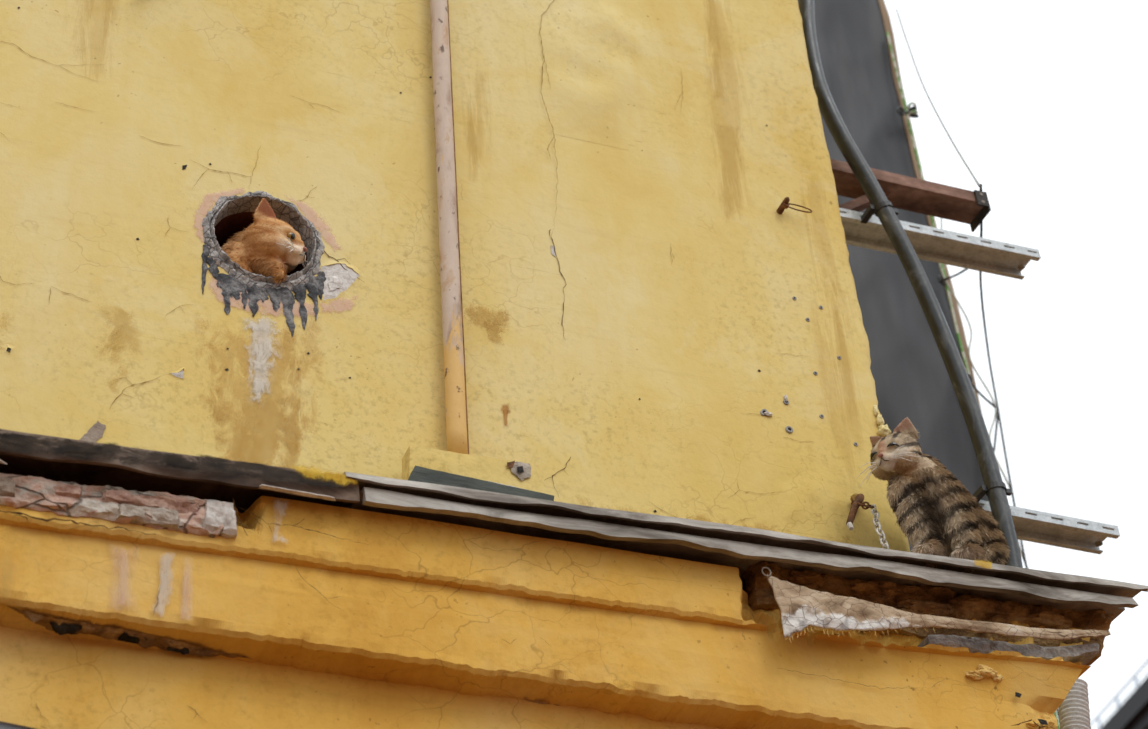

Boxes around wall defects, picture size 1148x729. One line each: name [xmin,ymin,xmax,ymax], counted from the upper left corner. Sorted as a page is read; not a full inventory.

crack [539,0,566,337]
peeling [194,189,243,239]
peeling [210,199,364,316]
water stain [246,318,277,398]
flaking render [965,664,1003,682]
flaking render [1026,714,1055,729]